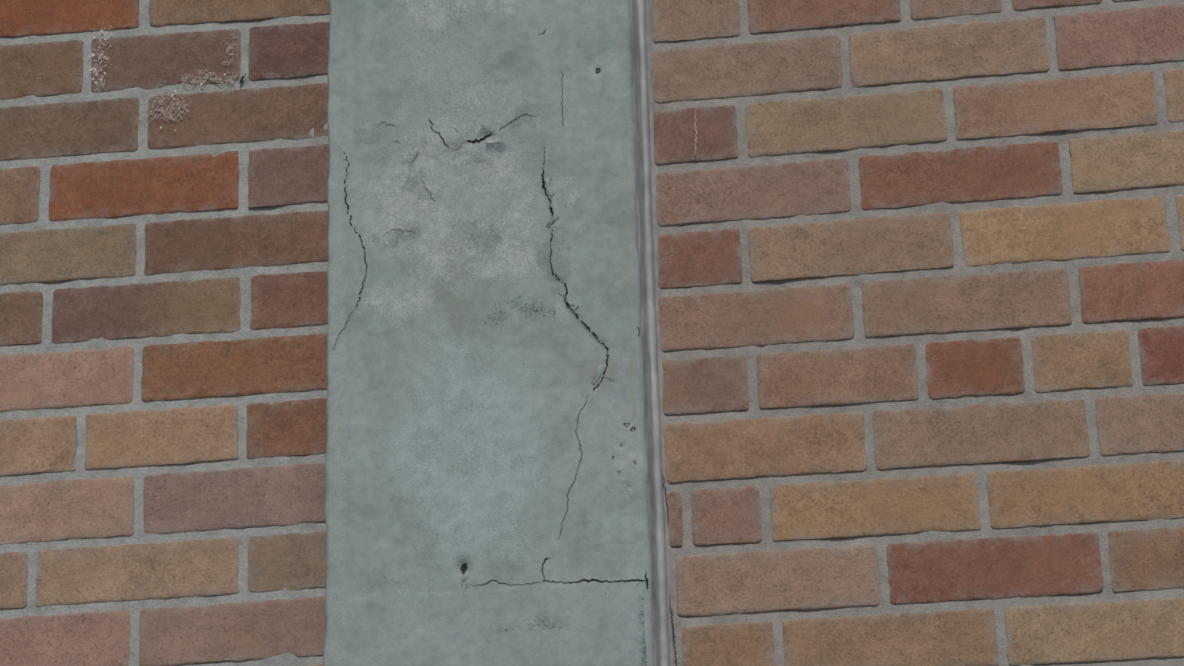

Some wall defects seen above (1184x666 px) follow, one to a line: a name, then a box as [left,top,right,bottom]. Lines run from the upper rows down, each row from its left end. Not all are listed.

crack [334,149,368,347]
crack [467,147,677,666]